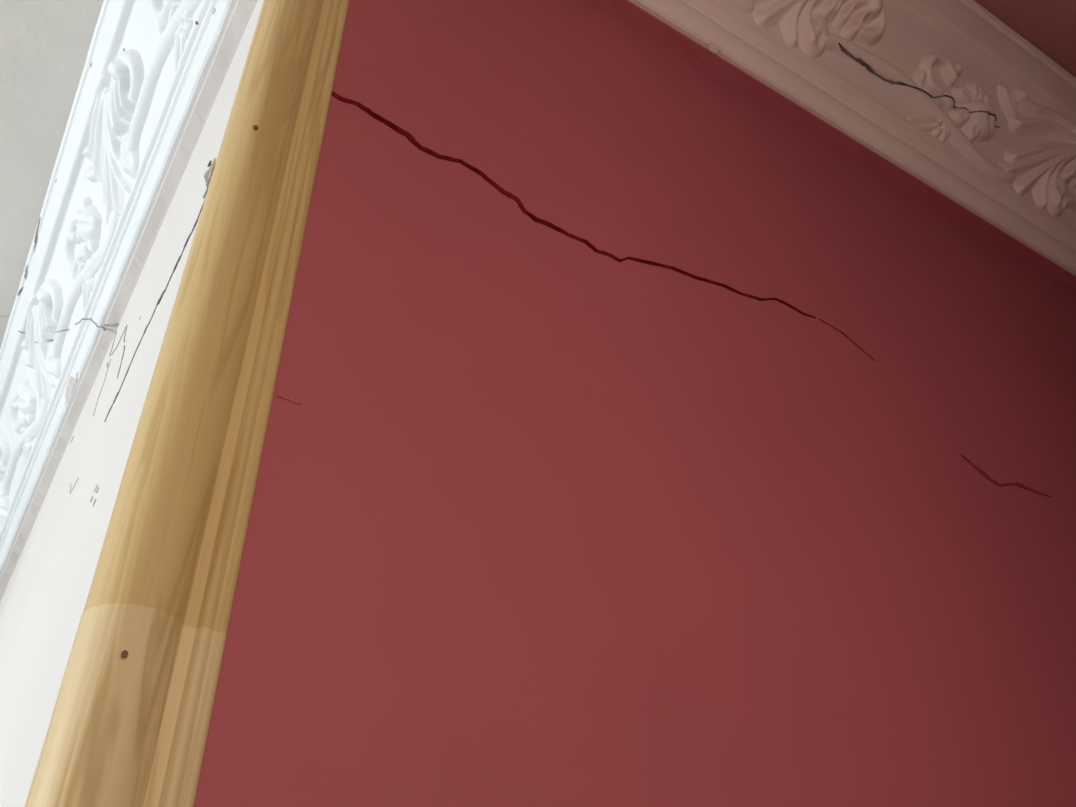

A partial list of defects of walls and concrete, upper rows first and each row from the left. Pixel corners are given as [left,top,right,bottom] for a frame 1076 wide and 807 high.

crack [838,42,1001,128]
crack [0,200,205,422]
crack [332,91,876,362]